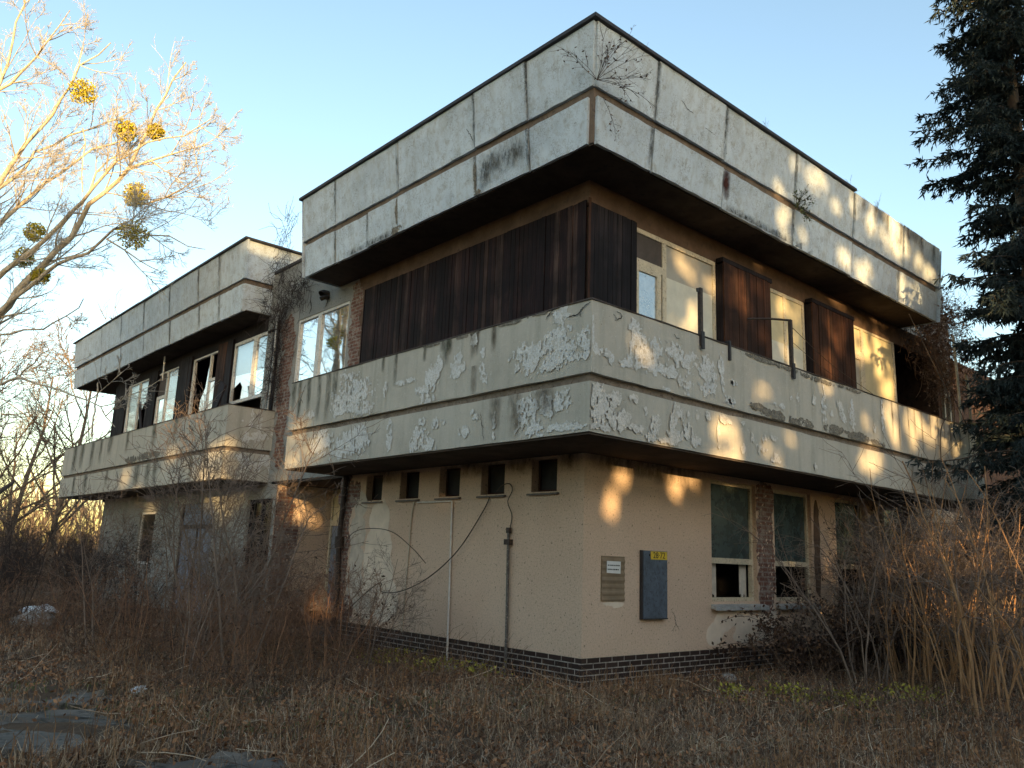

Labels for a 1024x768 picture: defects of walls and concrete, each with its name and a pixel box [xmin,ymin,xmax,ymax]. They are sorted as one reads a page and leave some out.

damp [473,130,529,180]
peeling [311,281,488,461]
peeling [508,306,785,465]